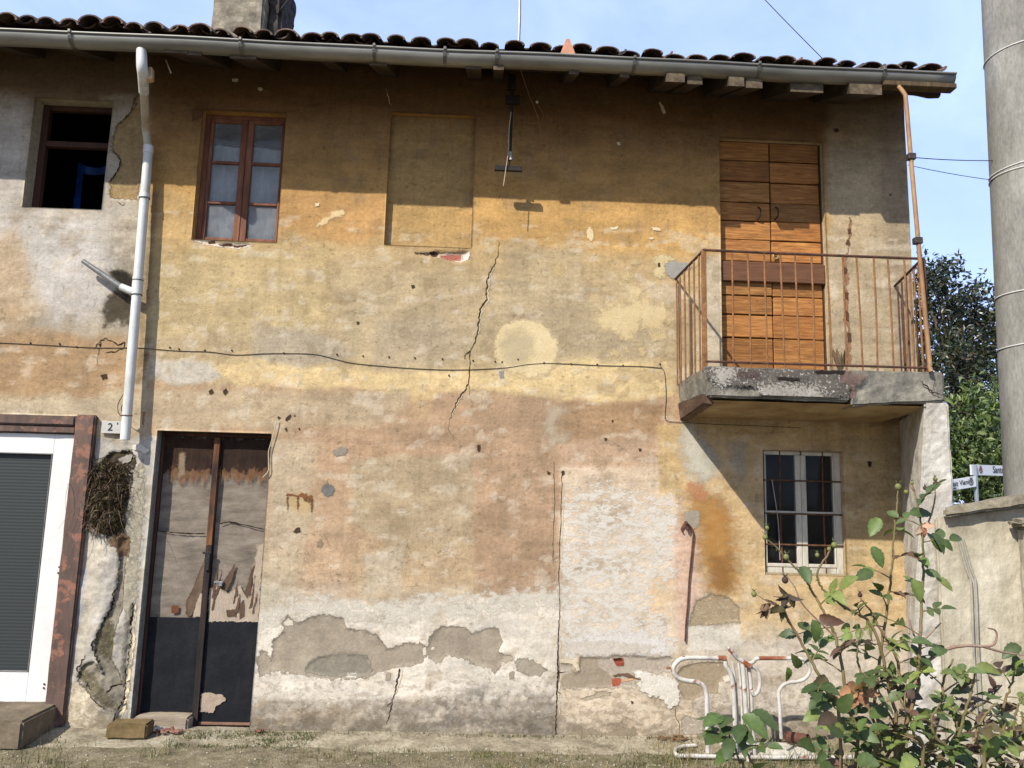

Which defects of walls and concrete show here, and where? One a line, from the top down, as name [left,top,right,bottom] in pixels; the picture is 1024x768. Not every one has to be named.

peeling [315,203,345,227]
peeling [414,251,470,263]
leakage [102,270,132,328]
crack [448,256,498,434]
rust [286,493,313,514]
peeling [255,480,730,704]
crack [552,476,564,735]
peeling [689,594,741,626]
crack [76,586,137,722]
crack [386,668,402,723]